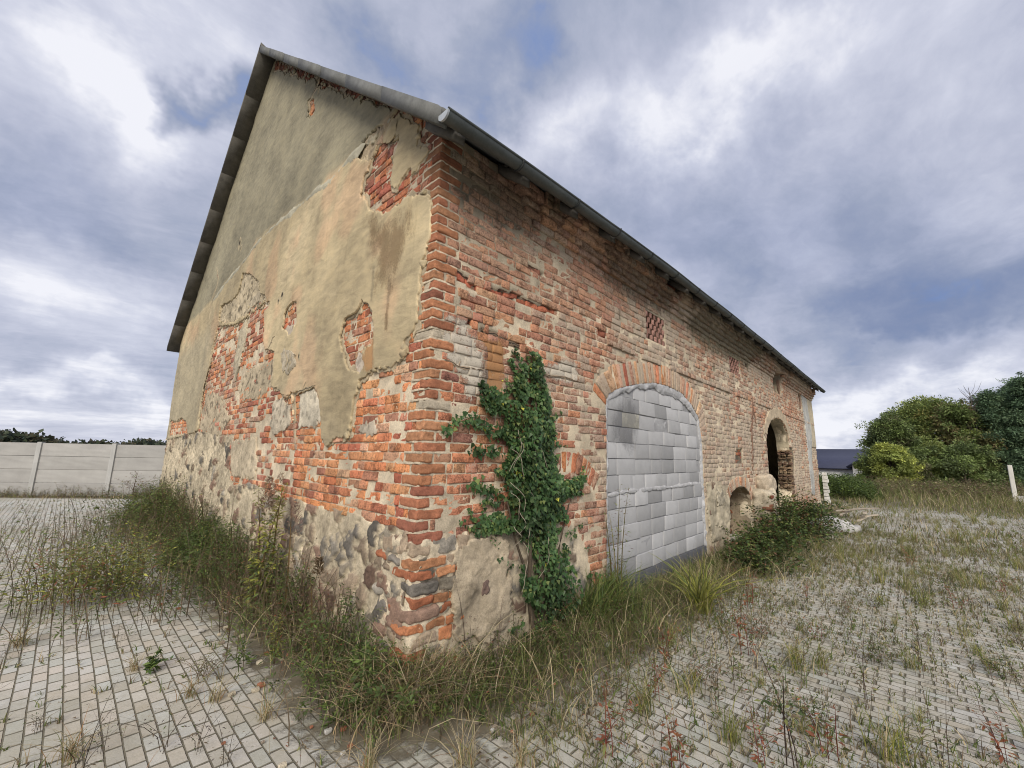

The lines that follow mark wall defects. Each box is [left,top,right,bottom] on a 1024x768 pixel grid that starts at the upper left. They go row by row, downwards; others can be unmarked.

spalling [275,61,434,214]
damp [370,215,410,281]
spalling [165,260,431,534]